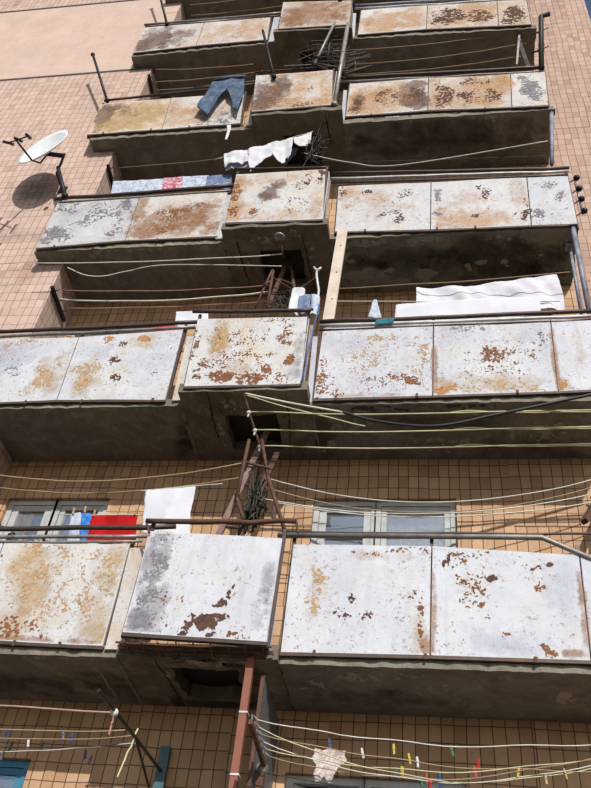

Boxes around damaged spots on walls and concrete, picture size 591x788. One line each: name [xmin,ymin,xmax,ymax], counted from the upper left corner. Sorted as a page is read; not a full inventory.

rust [431,5,527,25]
rust [348,78,502,114]
rust [126,198,217,239]
rust [192,353,295,384]
rust [315,355,350,396]
rust [360,373,424,391]
rust [433,383,458,394]
rust [551,349,573,390]
rust [0,615,47,641]
rust [177,584,235,637]
spalling [115,631,274,678]